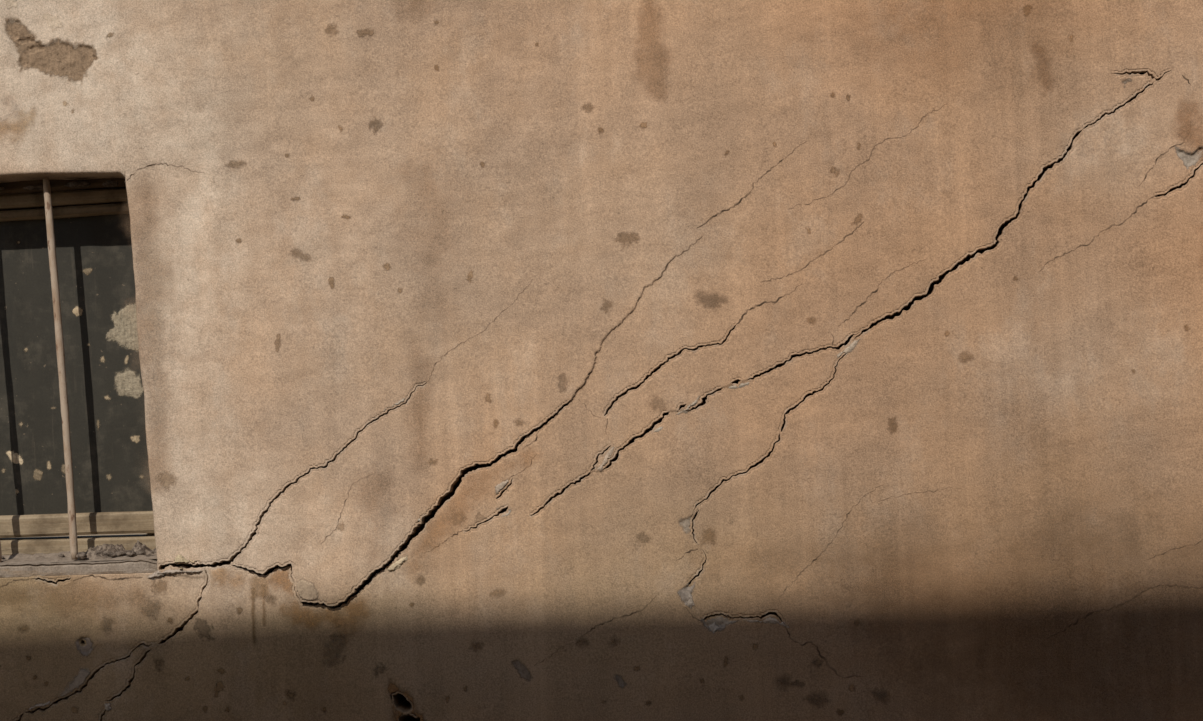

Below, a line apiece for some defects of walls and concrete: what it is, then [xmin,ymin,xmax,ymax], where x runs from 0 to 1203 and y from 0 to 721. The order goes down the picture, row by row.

spalling [5,18,97,81]
crack [125,162,204,183]
crack [1040,119,1203,271]
crack [674,69,1172,597]
crack [0,235,803,721]
crack [685,596,865,678]
crack [1045,538,1203,639]